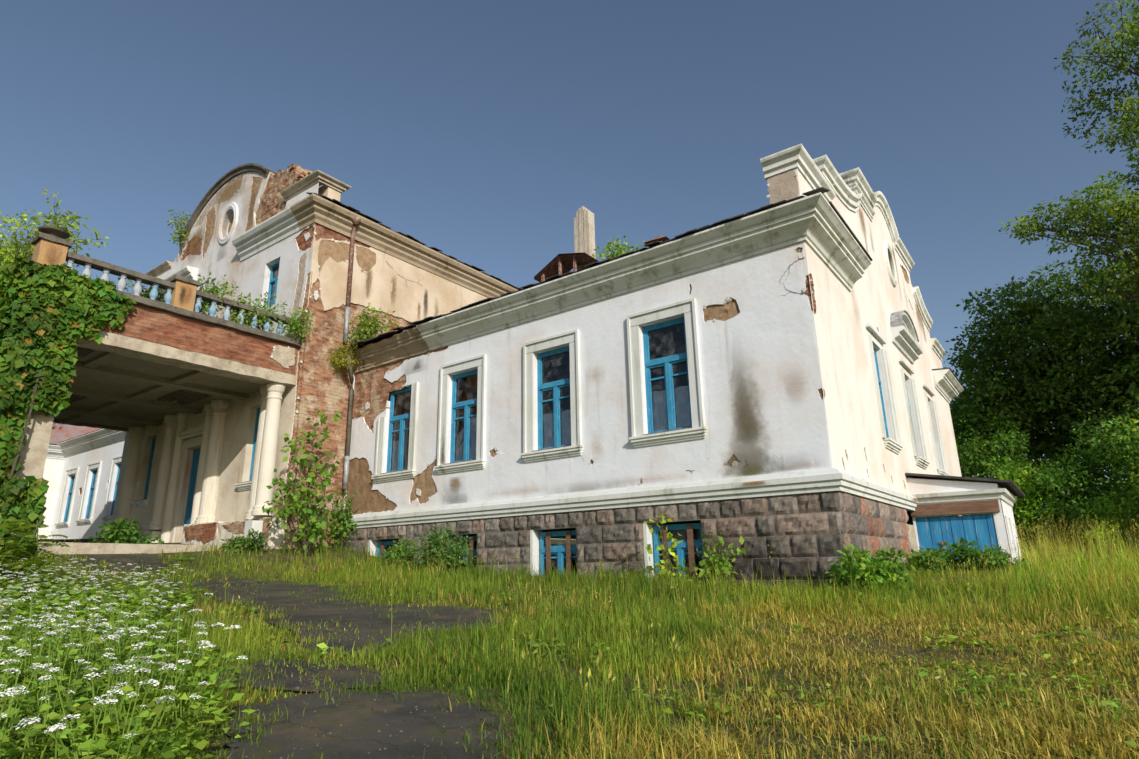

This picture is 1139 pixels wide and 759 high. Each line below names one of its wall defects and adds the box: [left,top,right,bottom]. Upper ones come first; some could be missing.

spalling [180,164,312,261]
flaking render [703,296,740,323]
flaking render [270,222,448,547]
flaking render [184,517,270,544]